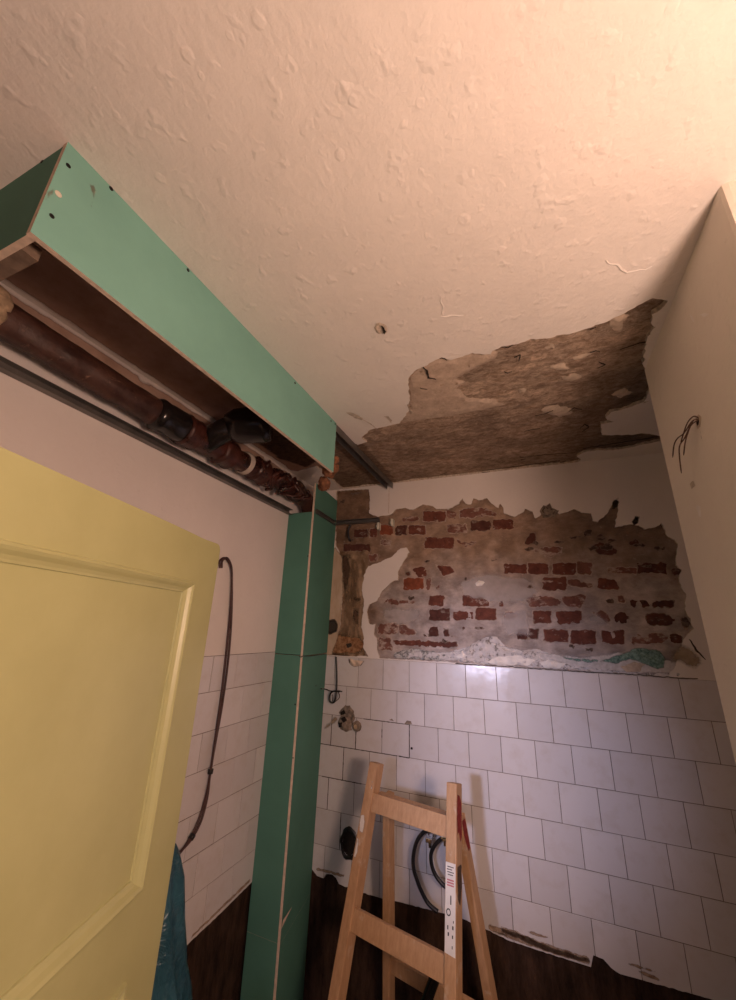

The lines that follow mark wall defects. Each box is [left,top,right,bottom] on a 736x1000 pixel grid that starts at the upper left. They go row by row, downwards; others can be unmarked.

flaking render [374,323,387,334]
flaking render [550,348,597,381]
flaking render [541,405,573,417]
flaking render [328,490,693,665]
leakage [394,636,700,676]
spalling [338,705,355,732]